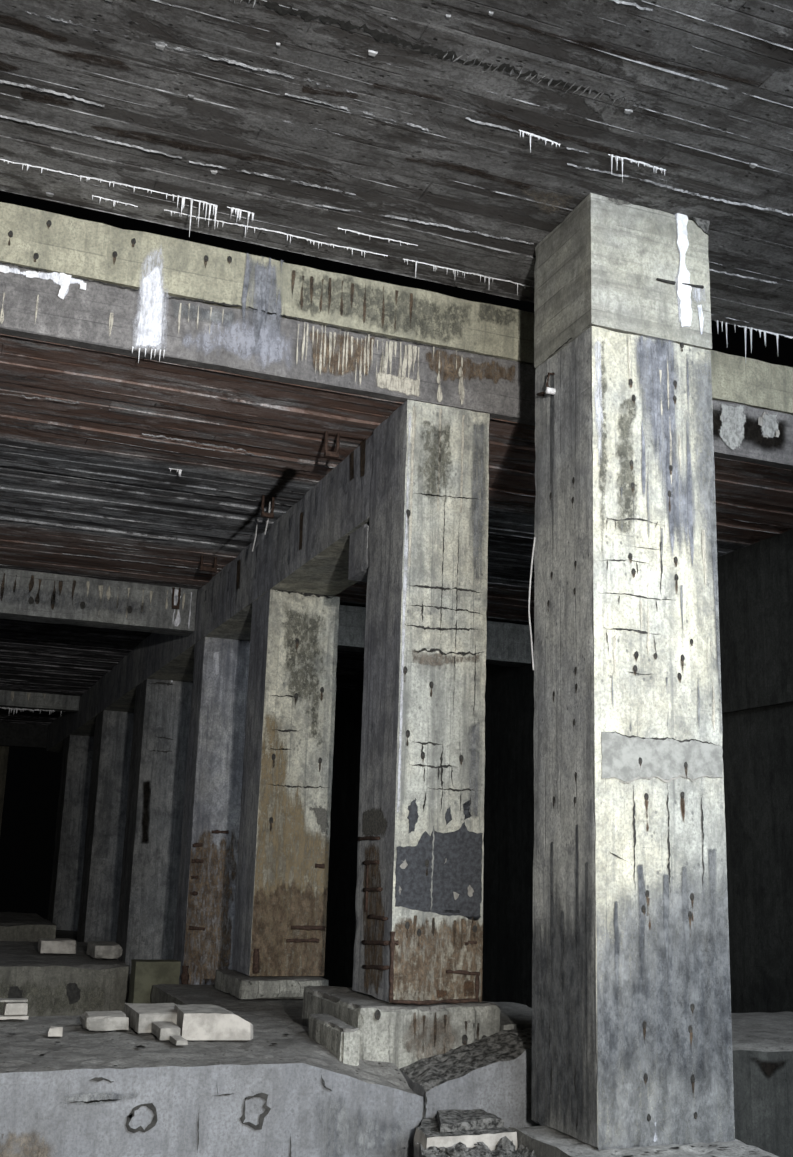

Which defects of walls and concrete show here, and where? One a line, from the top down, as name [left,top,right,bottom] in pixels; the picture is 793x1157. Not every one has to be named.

leakage [0,265,86,299]
efflorescence [676,213,704,334]
leakage [743,416,785,449]
leakage [132,251,520,817]
leakage [595,336,723,732]
corrosion [183,831,239,985]
corrosion [250,716,330,976]
spalling [286,925,326,943]
spalling [310,806,329,835]
peeling [357,798,483,1005]
corrosion [363,845,483,1003]